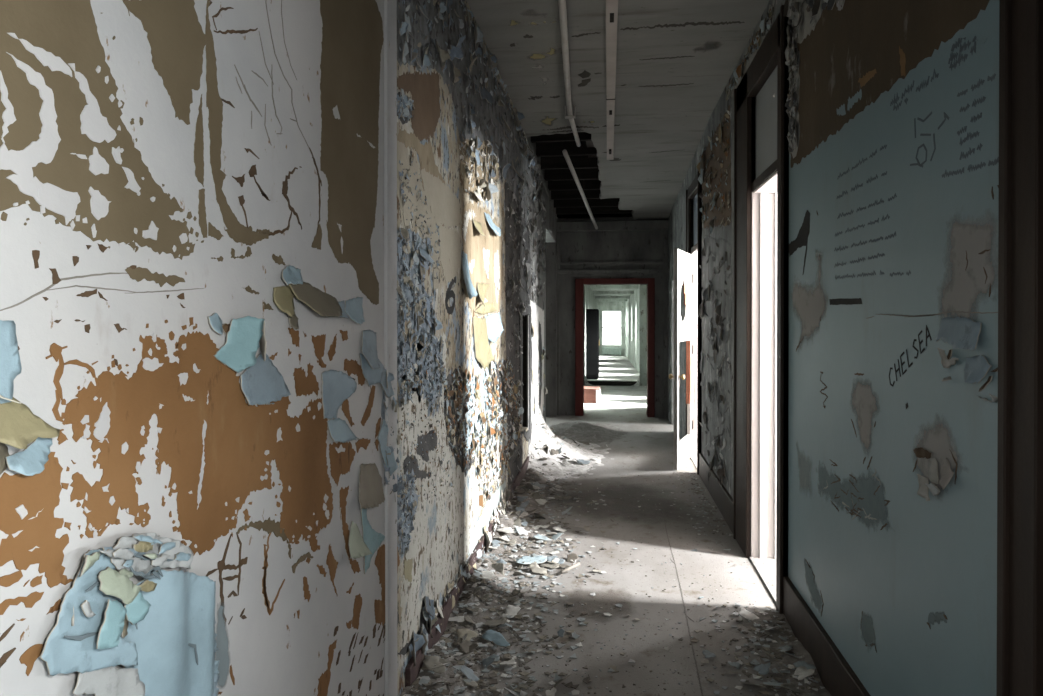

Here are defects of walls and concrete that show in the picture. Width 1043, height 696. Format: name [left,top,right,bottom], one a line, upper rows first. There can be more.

peeling [0,0,608,696]
peeling [698,235,732,488]
flaking render [913,423,958,501]